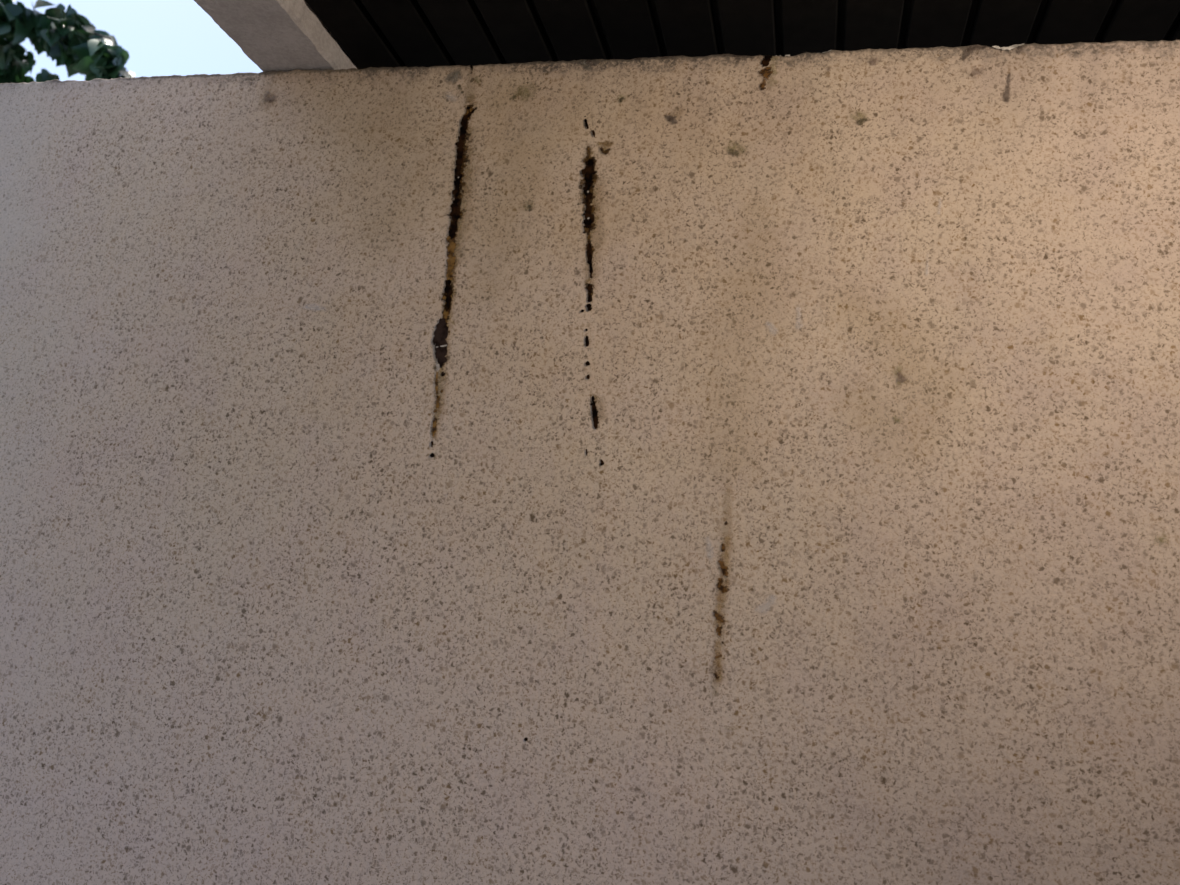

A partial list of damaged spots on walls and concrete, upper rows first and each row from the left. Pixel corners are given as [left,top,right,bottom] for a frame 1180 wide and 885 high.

crack [430,65,477,457]
crack [580,116,604,465]
corrosion [713,521,729,681]